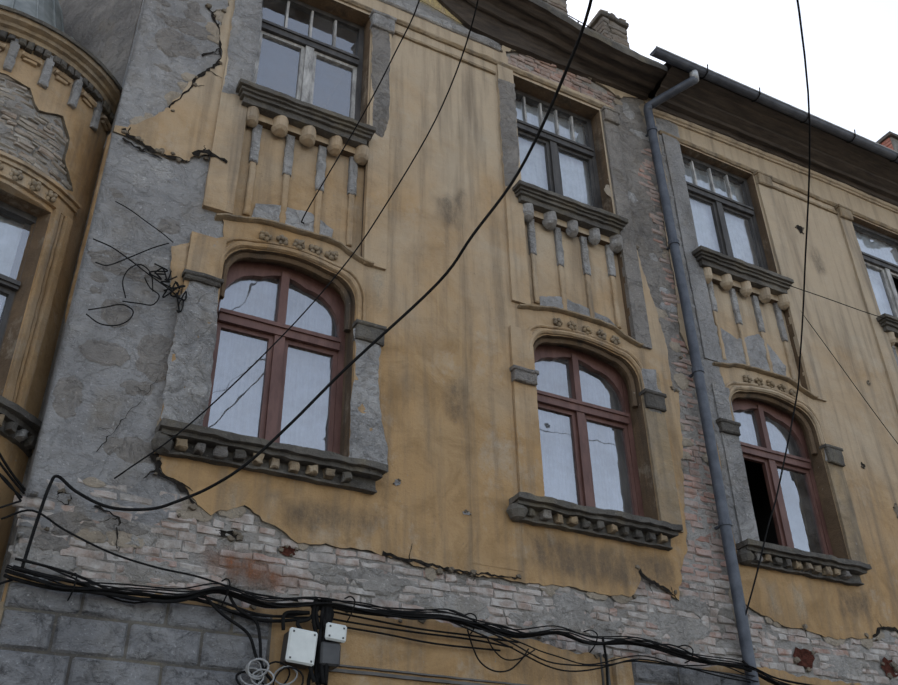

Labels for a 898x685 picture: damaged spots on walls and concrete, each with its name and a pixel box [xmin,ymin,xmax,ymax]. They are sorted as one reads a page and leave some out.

crack [169,3,222,112]
flaking render [500,49,621,108]
flaking render [7,335,742,669]
flaking render [746,606,898,685]